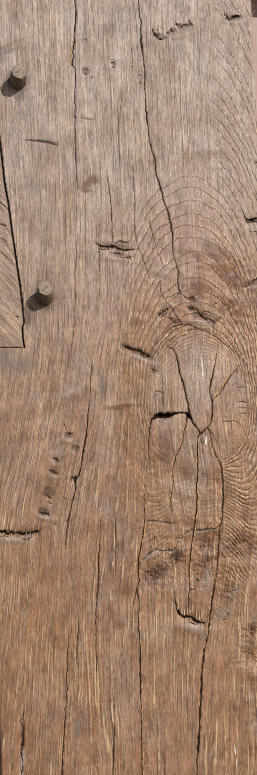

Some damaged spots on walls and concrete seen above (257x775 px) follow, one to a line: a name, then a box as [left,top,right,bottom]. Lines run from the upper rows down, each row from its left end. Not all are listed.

crack [0,530,36,540]
crack [62,0,252,775]